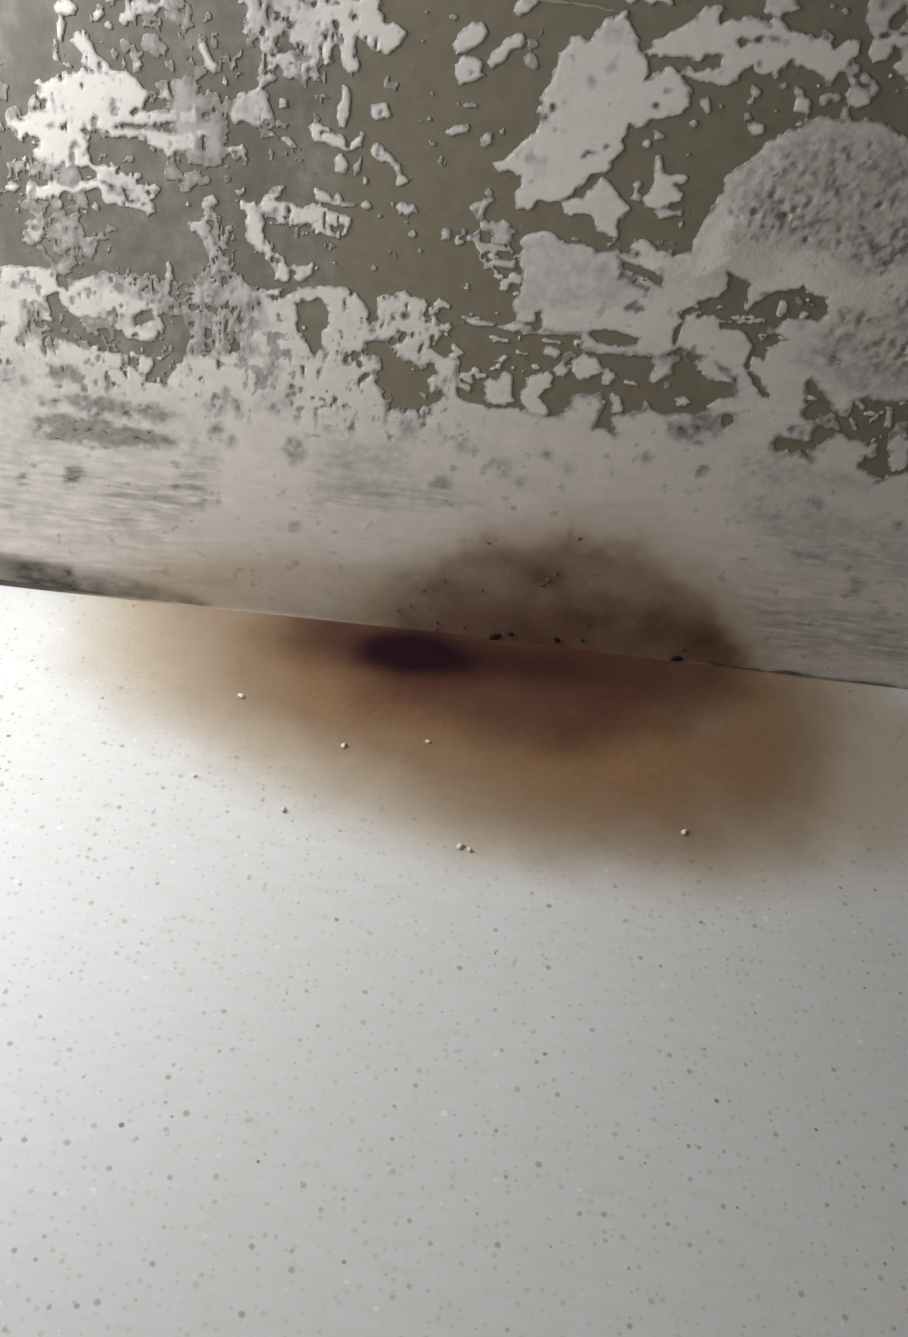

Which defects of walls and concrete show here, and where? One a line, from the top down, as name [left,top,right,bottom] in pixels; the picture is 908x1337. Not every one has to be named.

peeling [0,0,908,689]
damp [144,572,892,851]